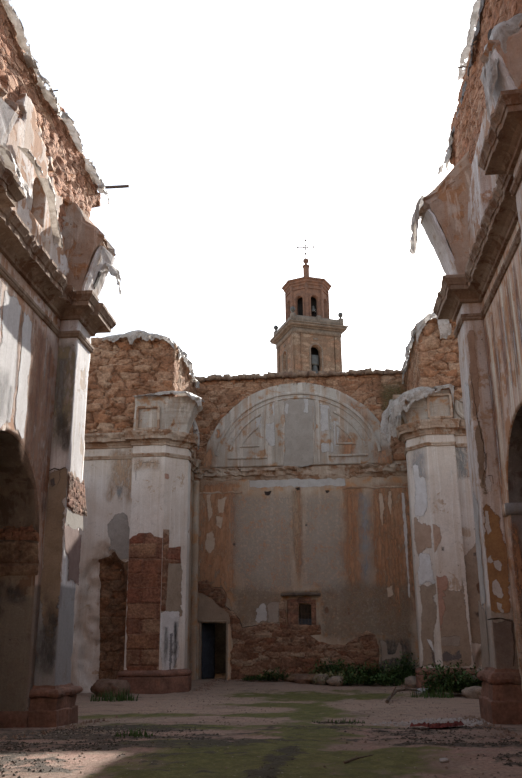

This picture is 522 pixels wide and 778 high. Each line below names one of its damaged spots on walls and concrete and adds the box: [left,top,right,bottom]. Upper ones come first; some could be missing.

peeling [0,279,32,438]
peeling [0,467,87,637]
spalling [98,513,183,679]
spalling [197,485,379,680]
peeling [401,330,517,669]